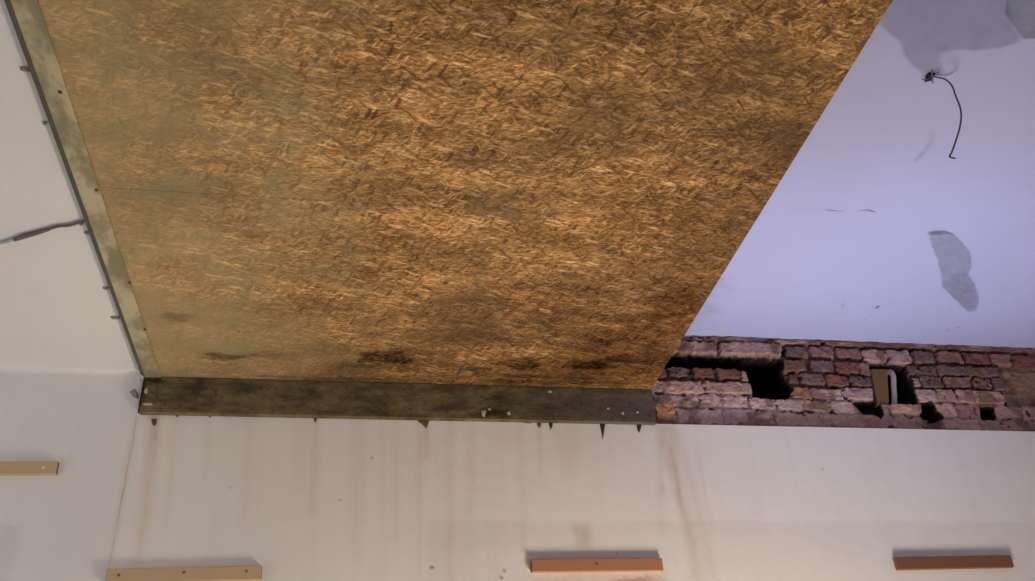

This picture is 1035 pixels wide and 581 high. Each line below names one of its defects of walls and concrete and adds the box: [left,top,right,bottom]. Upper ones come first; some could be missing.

flaking render [651,335,1035,432]